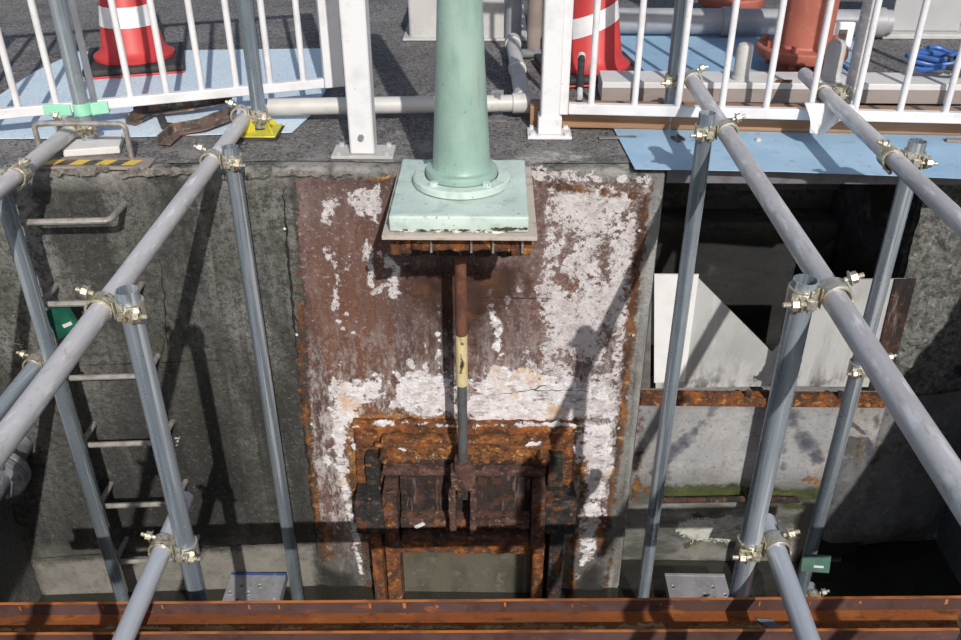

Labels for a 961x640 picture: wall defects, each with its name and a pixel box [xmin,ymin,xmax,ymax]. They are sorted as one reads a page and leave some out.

damp [517,150,604,183]
damp [616,174,652,188]
rust [343,407,475,511]
damp [198,296,627,590]
damp [37,559,113,595]
damp [121,557,148,592]
damp [156,556,186,591]